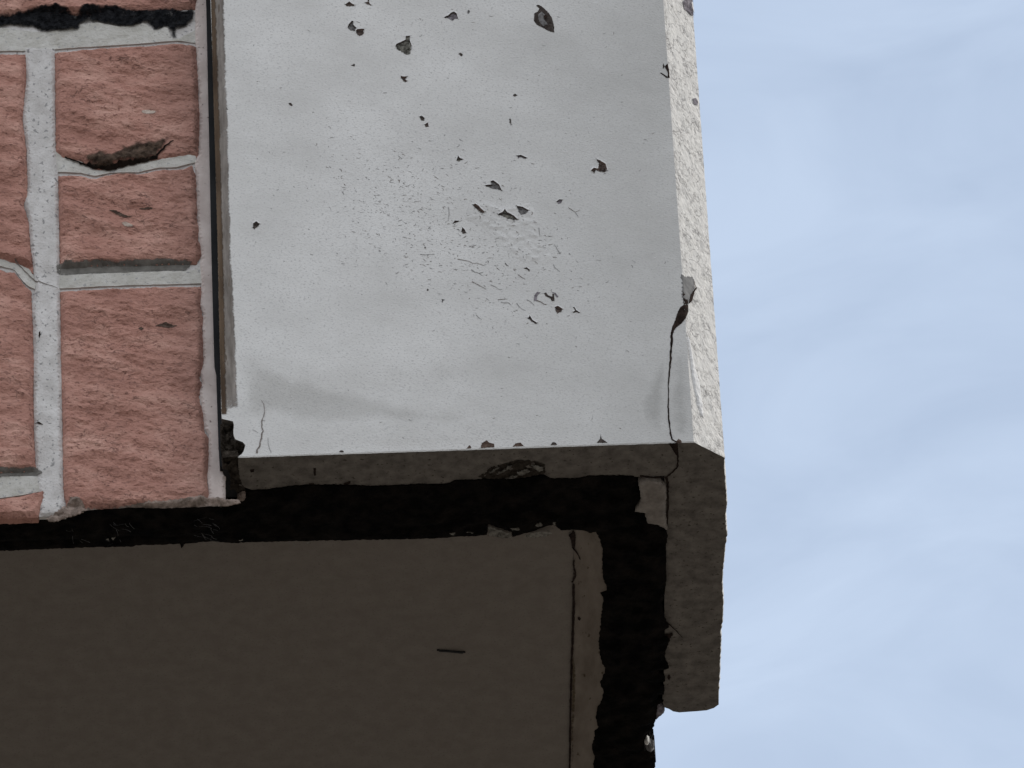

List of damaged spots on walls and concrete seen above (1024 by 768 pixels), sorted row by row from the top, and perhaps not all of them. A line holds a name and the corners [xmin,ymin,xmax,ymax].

peeling [347,20,365,36]
spalling [534,5,554,32]
peeling [395,35,412,55]
peeling [590,158,609,173]
peeling [498,205,529,220]
crack [640,281,697,527]
peeling [478,460,545,479]
spalling [46,496,98,522]
peeling [488,522,556,539]